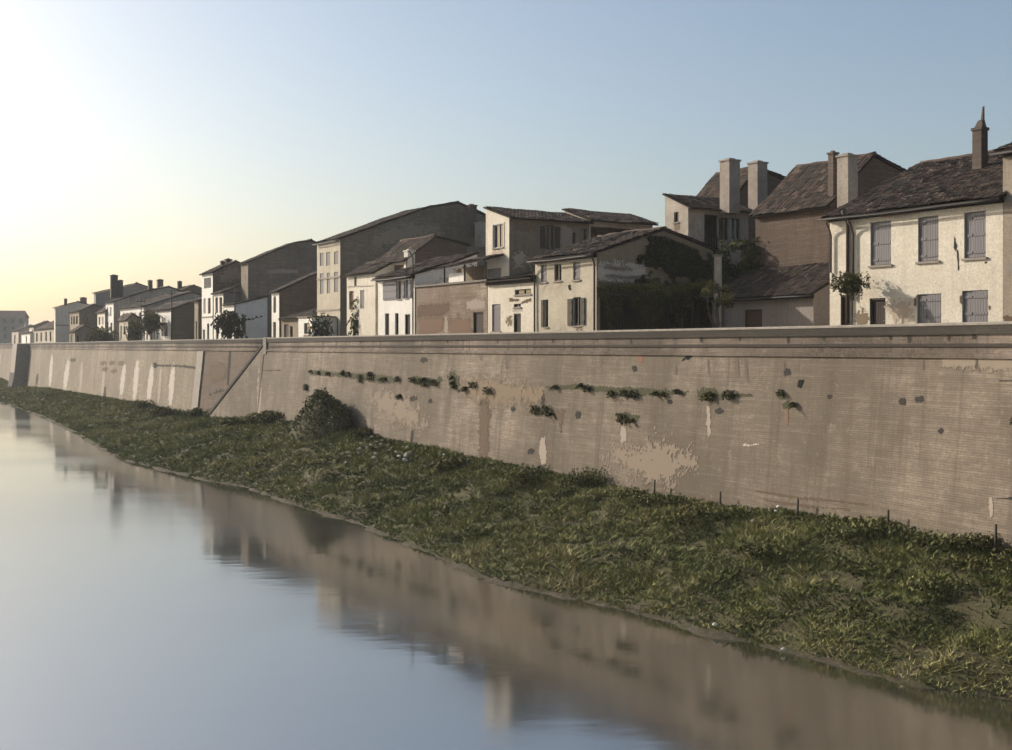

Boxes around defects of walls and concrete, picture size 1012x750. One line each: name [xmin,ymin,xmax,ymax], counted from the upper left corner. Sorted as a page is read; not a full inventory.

peeling [599,426,699,493]